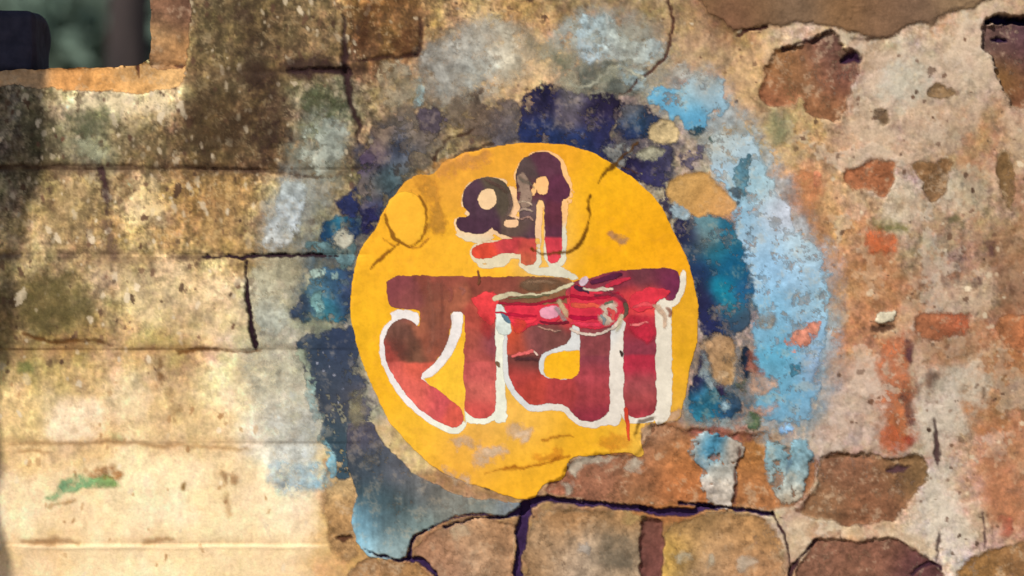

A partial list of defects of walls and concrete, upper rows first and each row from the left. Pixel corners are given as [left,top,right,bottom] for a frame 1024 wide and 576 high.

leakage [286,56,332,78]
crack [291,17,422,144]
crack [630,0,675,90]
spalling [701,0,982,122]
spalling [982,15,1024,108]
leakage [97,166,133,251]
spalling [912,158,953,202]
crack [23,333,104,344]
crack [178,253,338,354]
peeling [253,13,944,576]
spalling [957,541,1024,576]